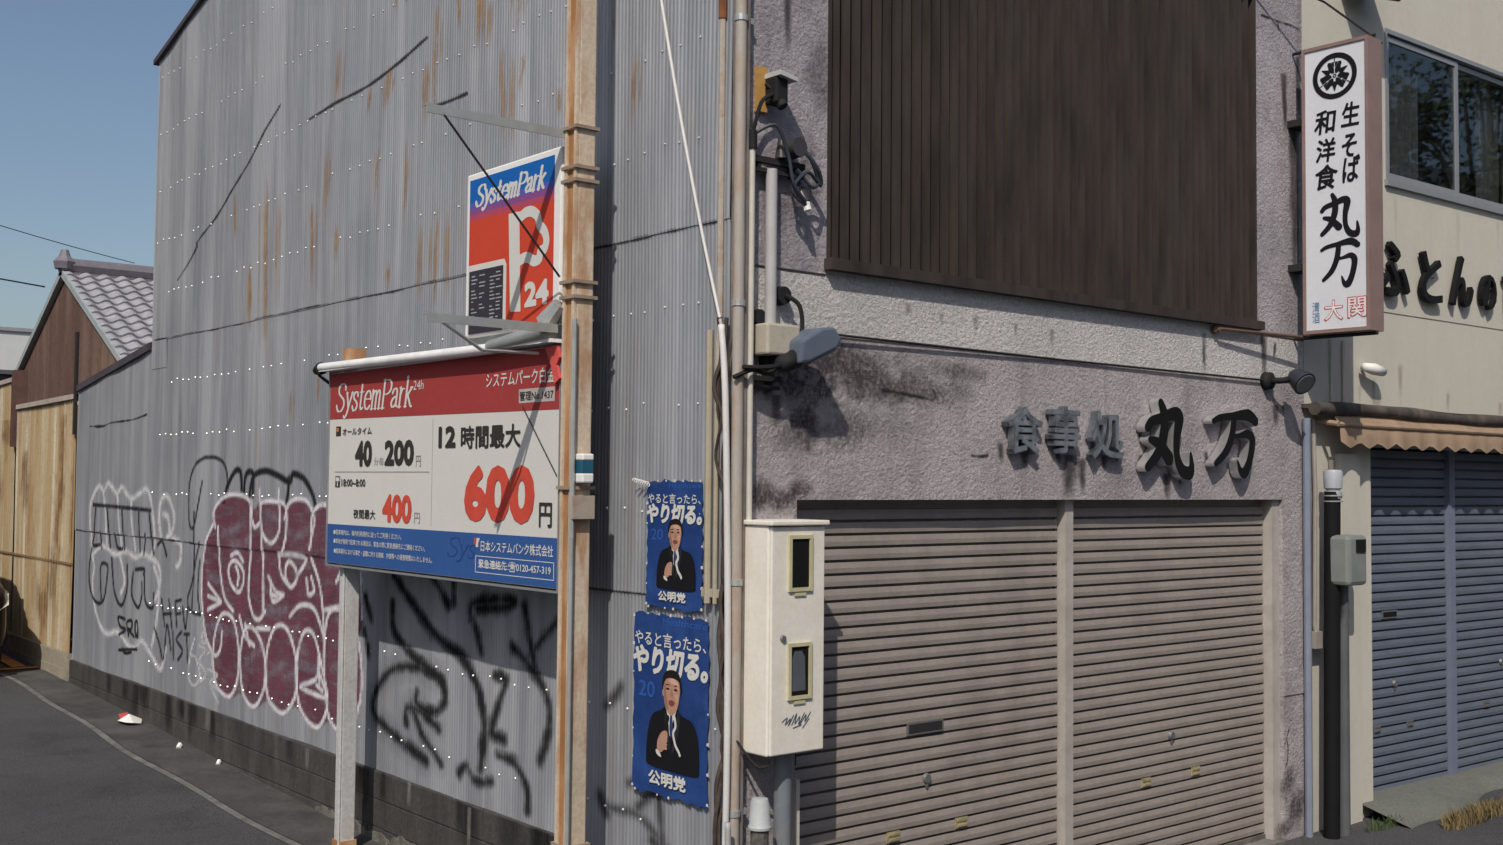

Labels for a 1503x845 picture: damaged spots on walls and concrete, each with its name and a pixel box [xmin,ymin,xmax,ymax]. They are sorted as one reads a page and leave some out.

water stain [765,347,944,449]
water stain [1056,450,1118,489]
mould [752,482,810,510]